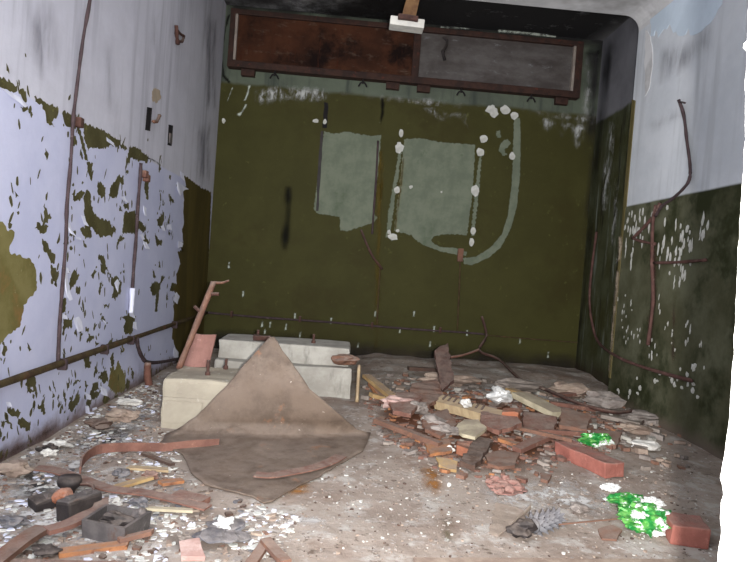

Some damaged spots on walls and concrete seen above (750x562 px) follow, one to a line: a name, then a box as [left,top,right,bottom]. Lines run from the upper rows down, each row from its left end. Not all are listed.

peeling [395,129,404,153]
peeling [477,130,511,156]
peeling [485,105,518,120]
peeling [618,208,652,271]
peeling [657,205,709,289]
peeling [0,63,214,561]
peeling [653,363,705,399]
peeling [209,498,297,562]